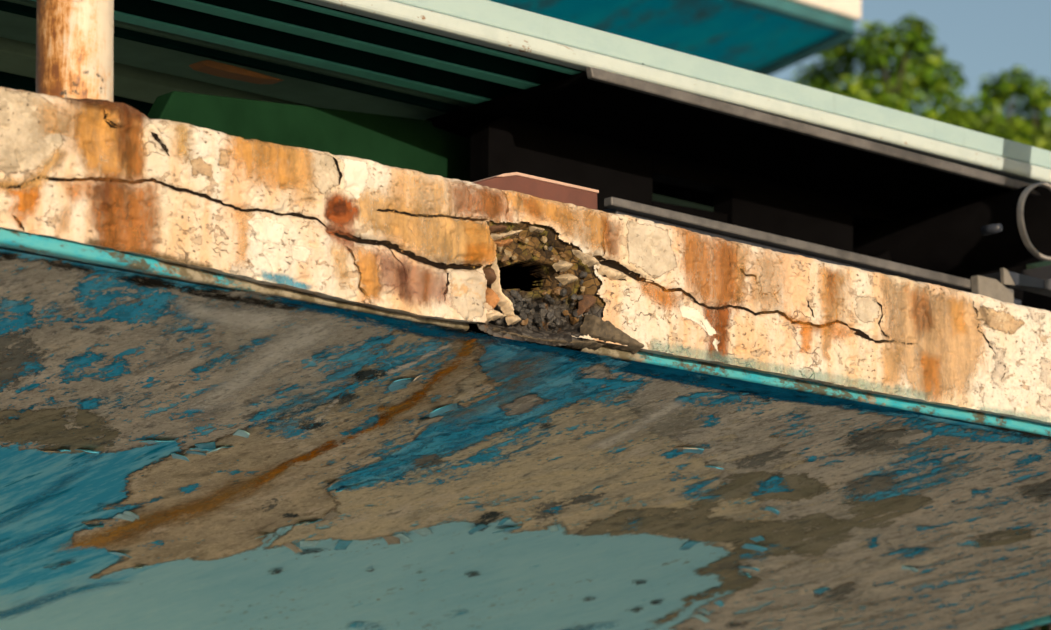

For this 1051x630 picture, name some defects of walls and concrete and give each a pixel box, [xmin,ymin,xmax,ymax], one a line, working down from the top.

rust [61,97,158,255]
crack [151,132,170,156]
crack [0,175,483,300]
rust [233,137,310,194]
crack [333,157,342,185]
crack [377,193,509,221]
rust [325,175,618,299]
rust [682,230,745,363]
crack [594,221,913,345]
rust [882,278,984,399]
rust [64,338,478,549]
peeling [0,217,1051,630]